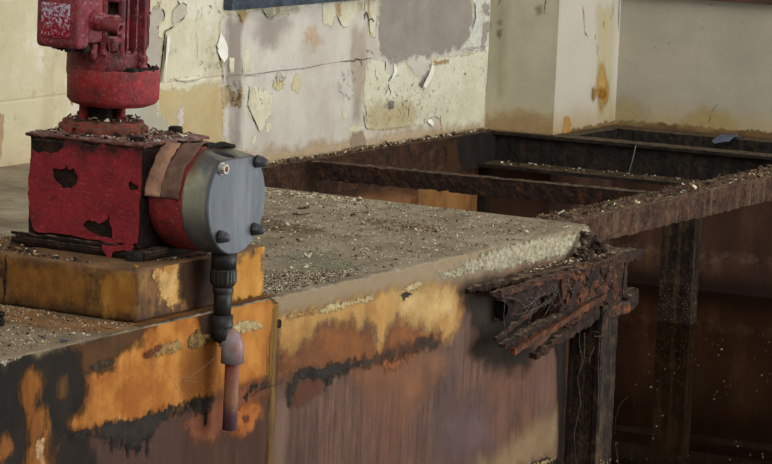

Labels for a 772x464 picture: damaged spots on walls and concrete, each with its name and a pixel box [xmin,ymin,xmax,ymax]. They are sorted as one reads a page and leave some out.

peeling [126,103,168,131]
peeling [146,3,163,67]
crack [150,0,243,76]
crack [197,13,489,130]
peeling [217,0,490,159]
rust [592,10,611,114]
rust [357,189,478,212]
spalling [435,229,590,280]
rust [0,247,465,442]
rust [0,434,14,464]
rust [21,367,51,464]